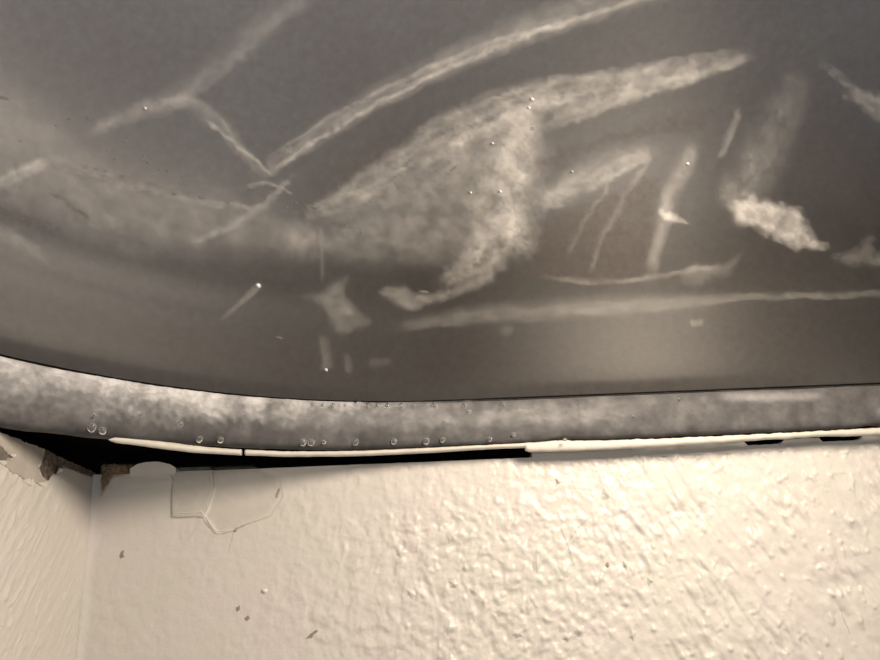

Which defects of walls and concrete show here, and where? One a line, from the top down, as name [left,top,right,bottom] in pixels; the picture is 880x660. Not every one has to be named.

peeling [0,433,100,488]